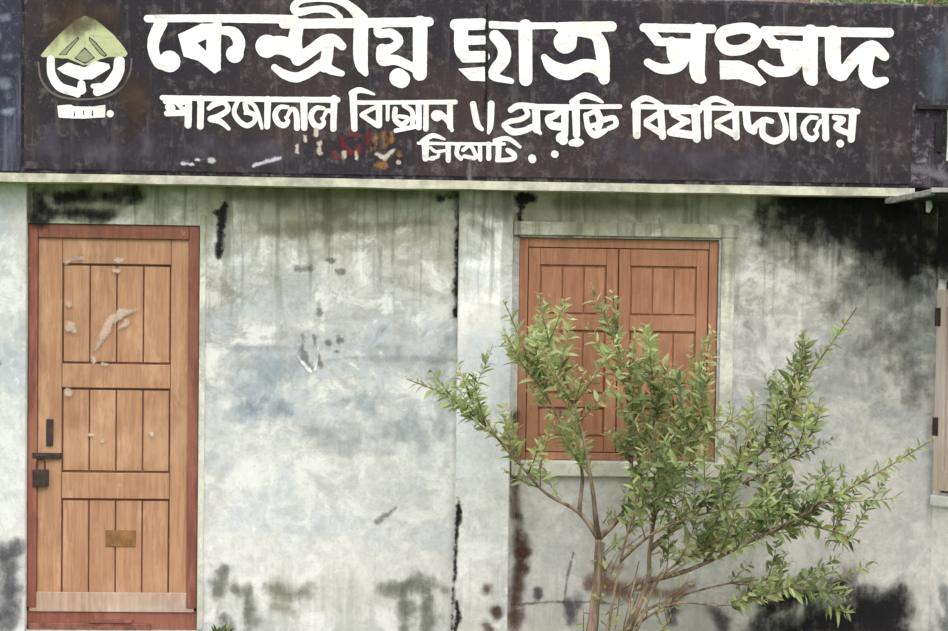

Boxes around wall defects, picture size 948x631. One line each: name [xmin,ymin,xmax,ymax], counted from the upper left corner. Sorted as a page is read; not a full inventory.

leakage [27,186,145,227]
leakage [213,202,228,259]
leakage [264,190,406,232]
leakage [756,190,948,296]
leakage [0,539,24,631]
leakage [213,565,256,625]
leakage [269,583,308,601]
leakage [380,574,433,631]
leakage [565,600,580,623]
leakage [745,573,913,631]